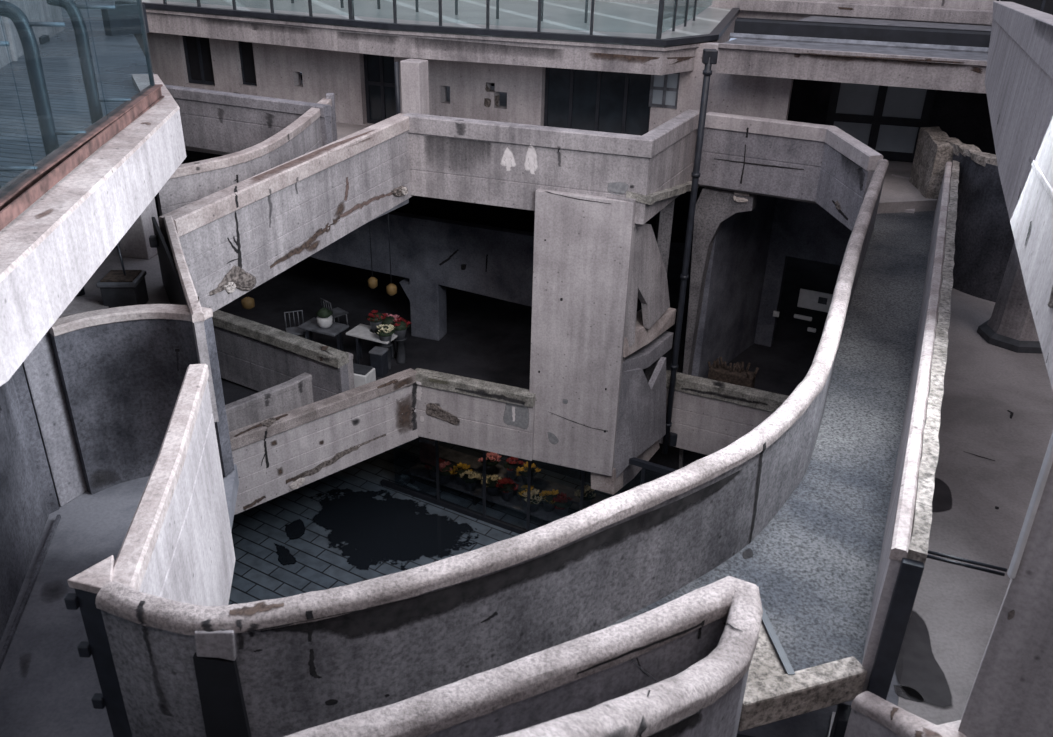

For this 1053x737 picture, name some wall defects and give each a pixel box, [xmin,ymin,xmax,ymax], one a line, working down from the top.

crack [716,127,804,184]
spalling [392,186,408,197]
crack [226,175,242,268]
spalling [426,403,460,425]
crack [261,425,269,468]
spalling [286,434,386,490]
water stain [135,601,172,717]